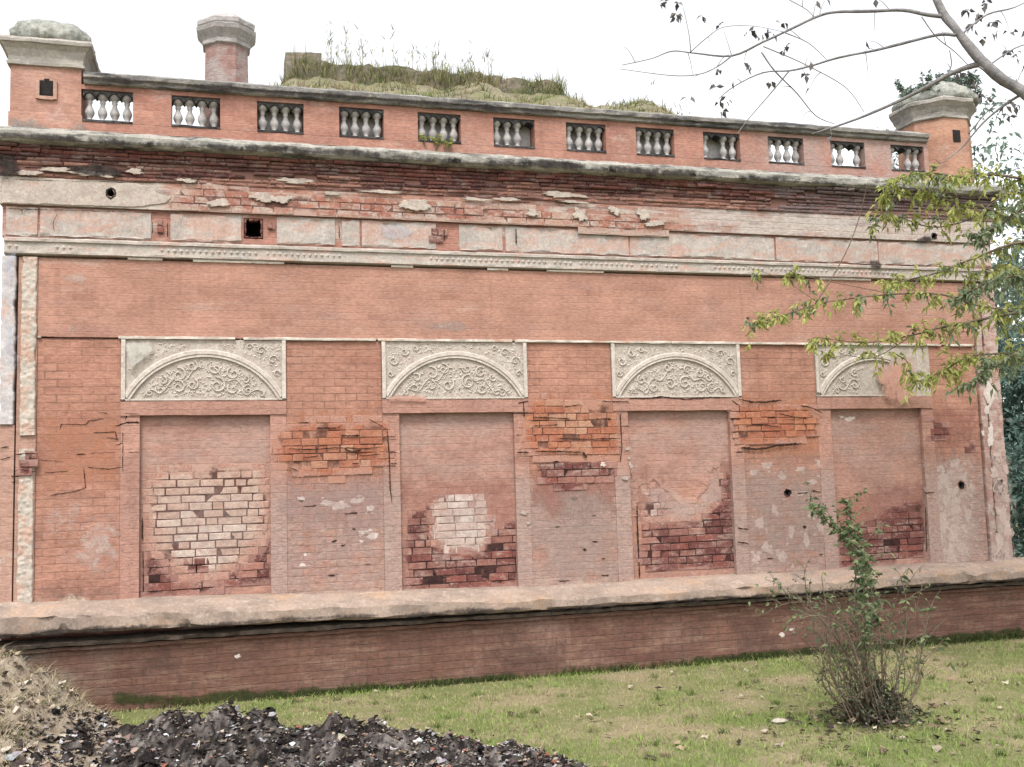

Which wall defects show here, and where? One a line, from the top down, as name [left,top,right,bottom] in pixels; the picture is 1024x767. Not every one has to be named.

spalling [2,167,698,243]
crack [0,400,140,496]
flaking render [139,410,396,597]
crack [289,419,398,501]
spalling [401,494,531,589]
spalling [516,393,734,572]
spalling [727,397,926,568]
peeling [935,378,1015,562]